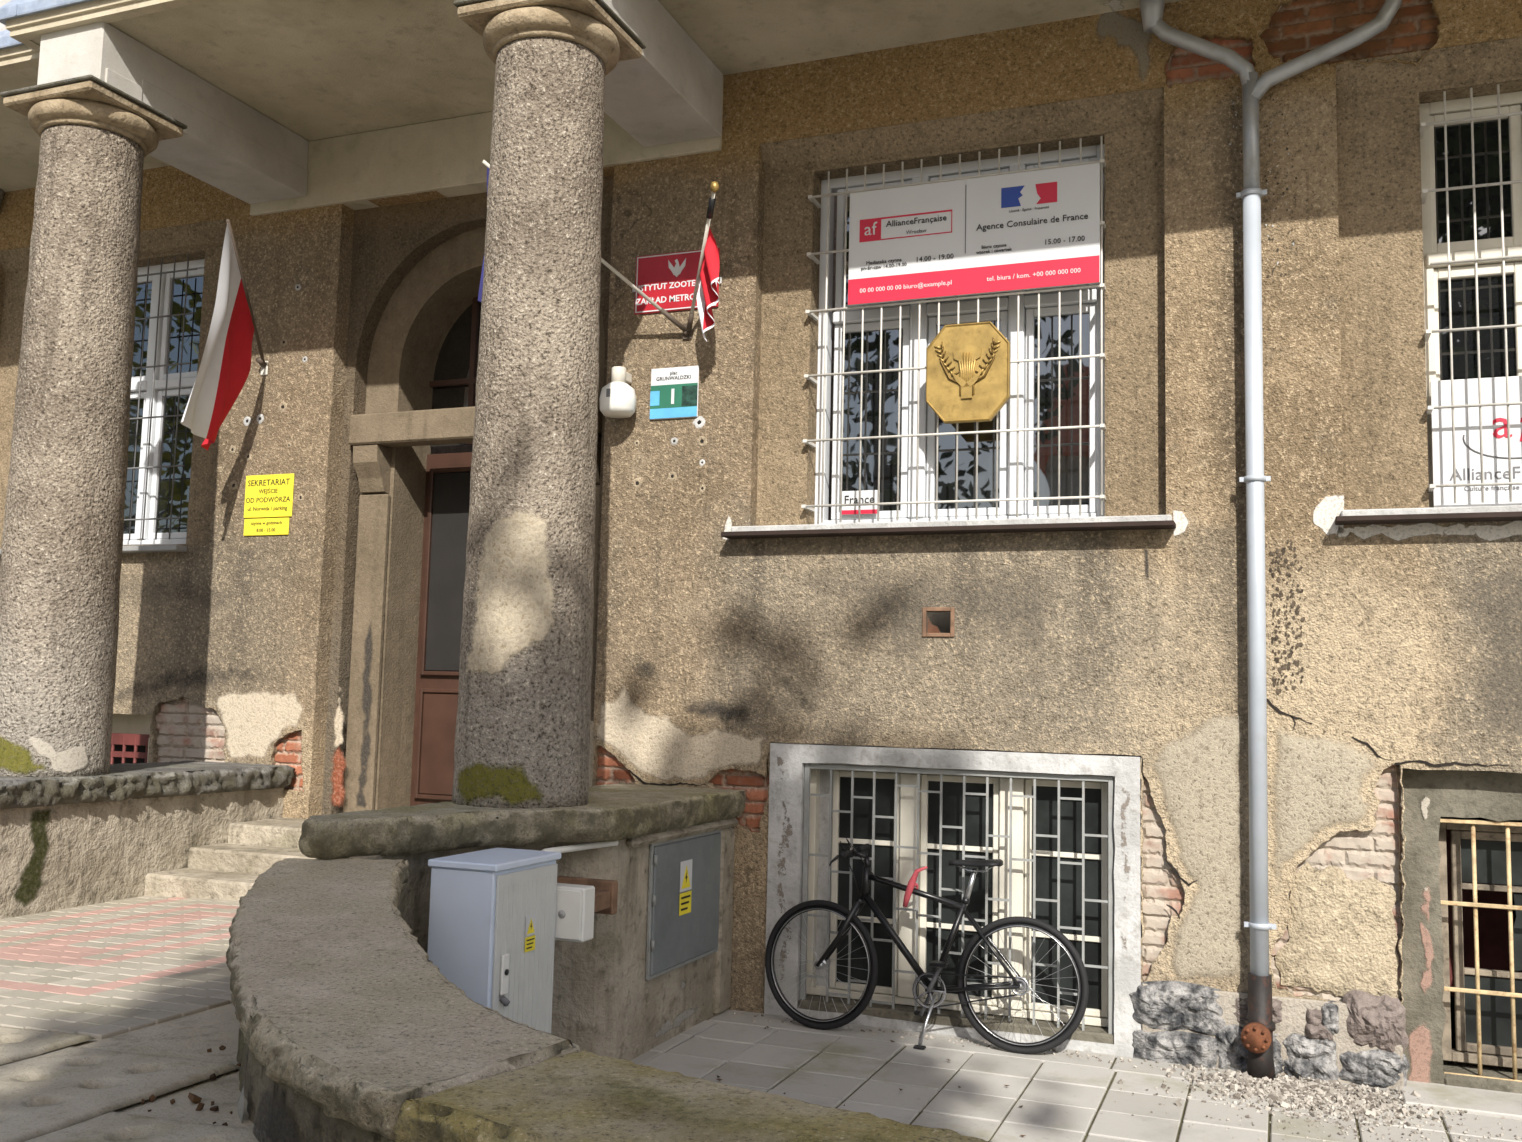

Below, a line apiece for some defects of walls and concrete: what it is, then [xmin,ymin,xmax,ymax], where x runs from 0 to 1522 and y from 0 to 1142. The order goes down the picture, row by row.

flaking render [1163,0,1442,90]
flaking render [467,511,555,674]
flaking render [151,692,305,793]
crack [1267,699,1312,730]
crack [1352,737,1509,767]
damp [15,810,50,904]
flaking render [589,688,792,980]
flaking render [1120,756,1186,982]
flaking render [1269,761,1434,1006]
peeling [1409,1026,1432,1083]